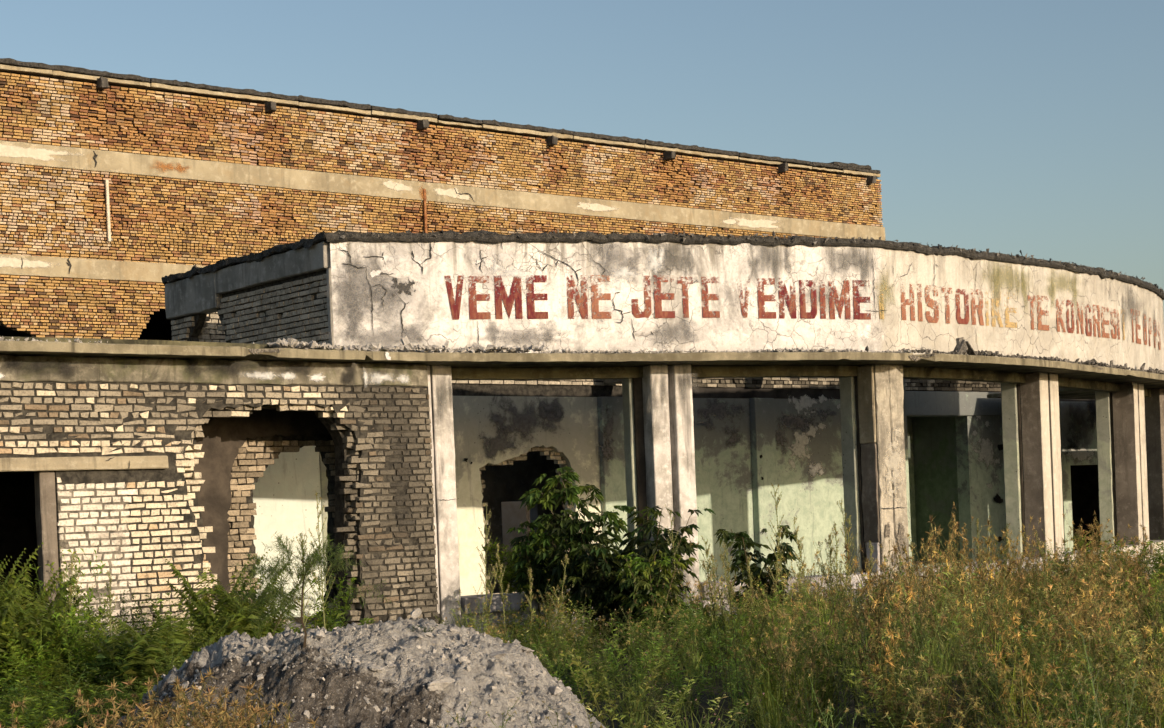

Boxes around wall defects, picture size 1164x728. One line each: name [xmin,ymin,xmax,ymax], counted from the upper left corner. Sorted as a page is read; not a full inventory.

rust [157,163,188,172]
crack [338,242,432,336]
peeling [775,395,840,476]